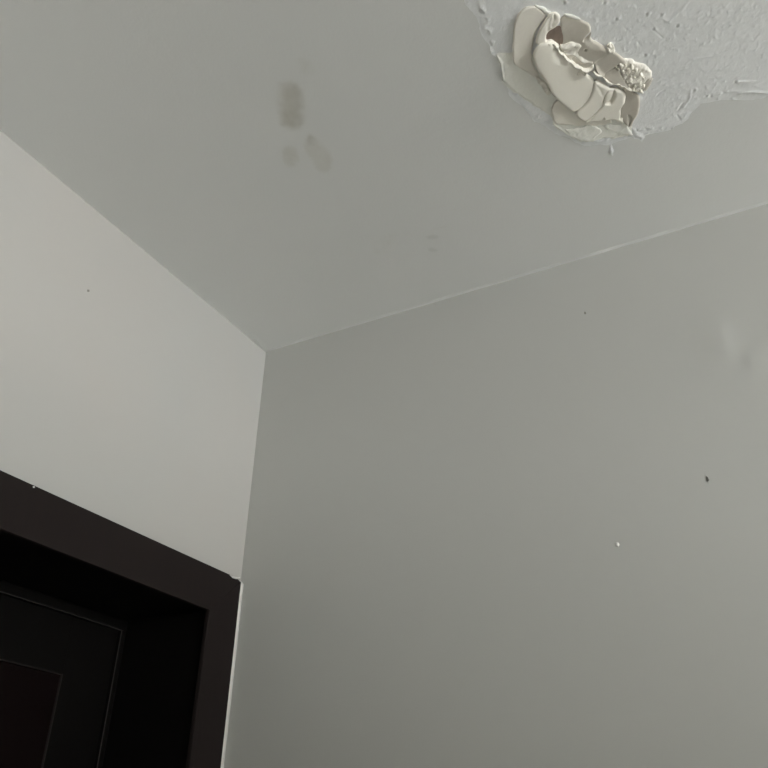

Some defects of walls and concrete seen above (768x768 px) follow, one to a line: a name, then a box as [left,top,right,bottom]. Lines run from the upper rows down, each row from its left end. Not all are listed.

spalling [496,5,653,156]